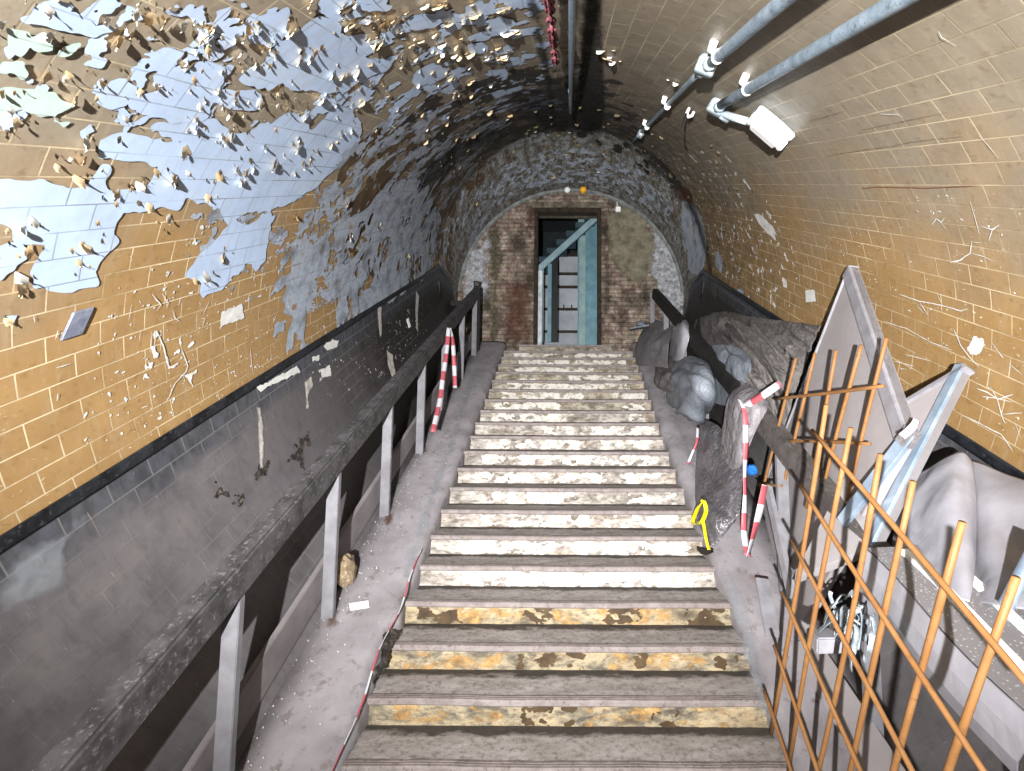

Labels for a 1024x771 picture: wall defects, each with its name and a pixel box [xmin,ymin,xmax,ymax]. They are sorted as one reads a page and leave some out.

peeling [0,0,797,439]
leakage [650,154,717,297]
leakage [464,228,502,341]
leakage [650,232,684,325]
peeling [805,290,816,302]
crack [129,294,209,407]
spalling [287,431,311,470]
spalling [254,460,270,481]
rust [457,608,536,624]
rust [630,609,672,625]
rust [404,653,501,669]
rust [586,707,660,727]